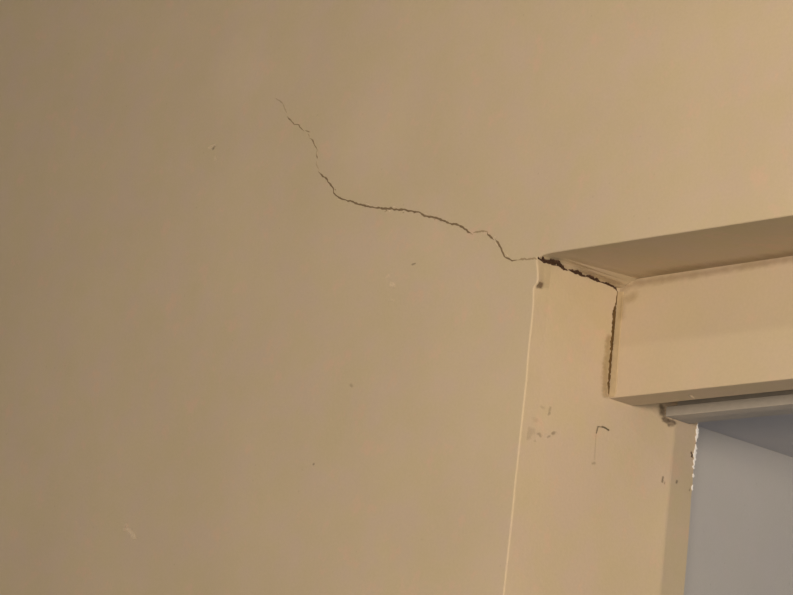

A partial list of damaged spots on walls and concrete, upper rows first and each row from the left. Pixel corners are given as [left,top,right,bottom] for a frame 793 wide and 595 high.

crack [276,98,618,394]